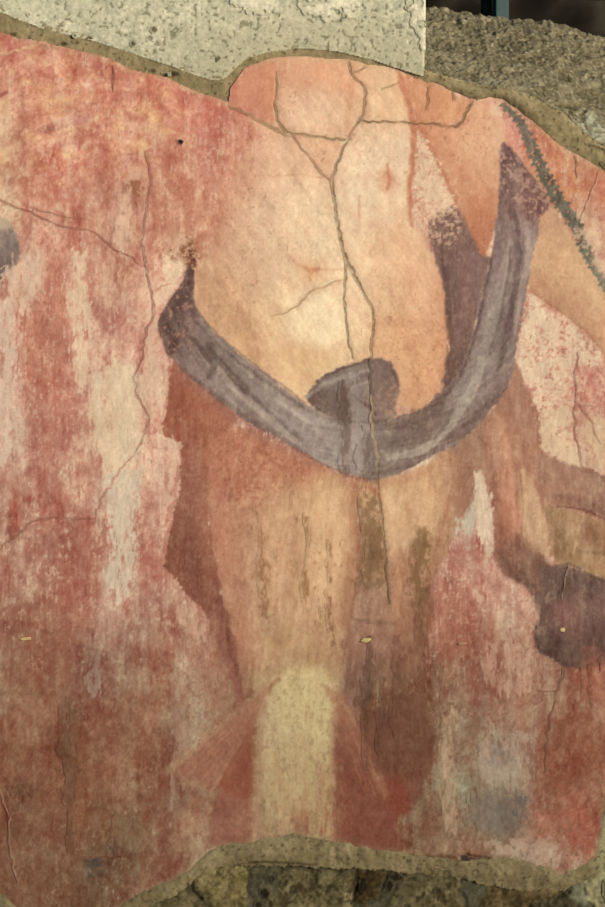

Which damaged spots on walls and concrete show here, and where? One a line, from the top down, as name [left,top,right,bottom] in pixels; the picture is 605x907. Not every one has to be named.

crack [0,41,48,58]
crack [109,65,117,92]
crack [0,151,172,551]
crack [229,61,476,605]